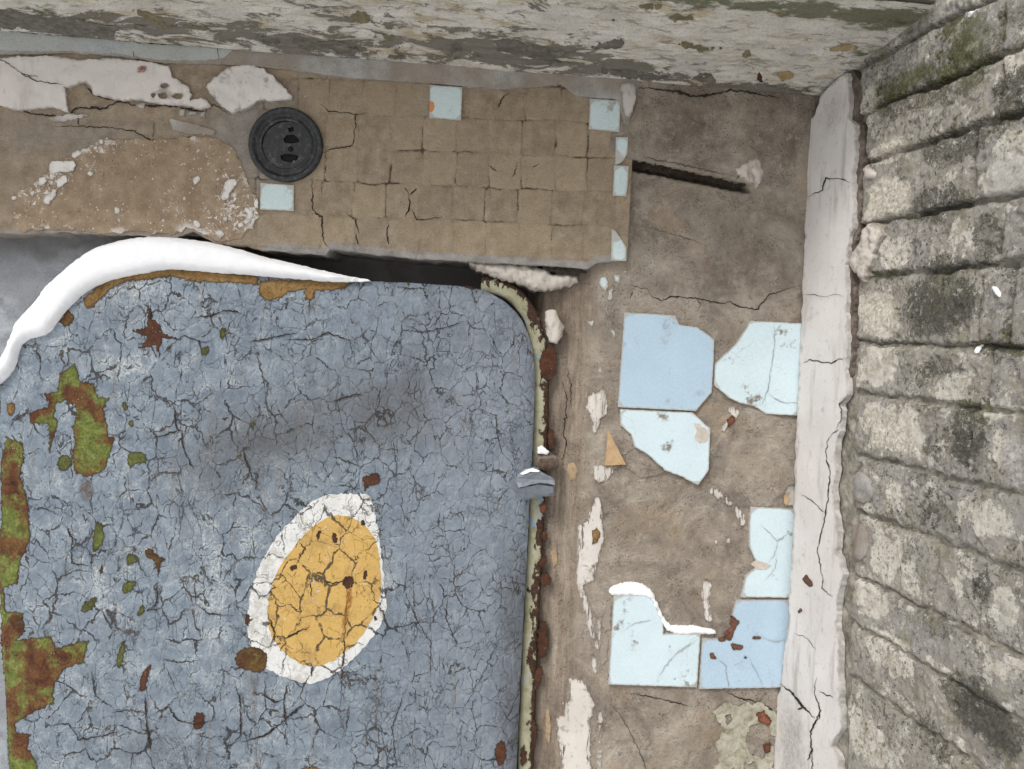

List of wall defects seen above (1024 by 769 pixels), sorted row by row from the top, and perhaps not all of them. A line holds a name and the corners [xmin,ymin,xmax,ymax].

peeling [0,8,120,39]
peeling [0,55,293,136]
crack [632,156,746,188]
corrosion [132,306,180,356]
corrosion [539,347,557,381]
crack [802,400,844,596]
peeling [577,497,611,680]
crack [49,670,208,750]
corrosion [234,647,267,692]
crack [228,665,313,748]
peeling [545,678,603,769]
corrosion [718,616,761,659]